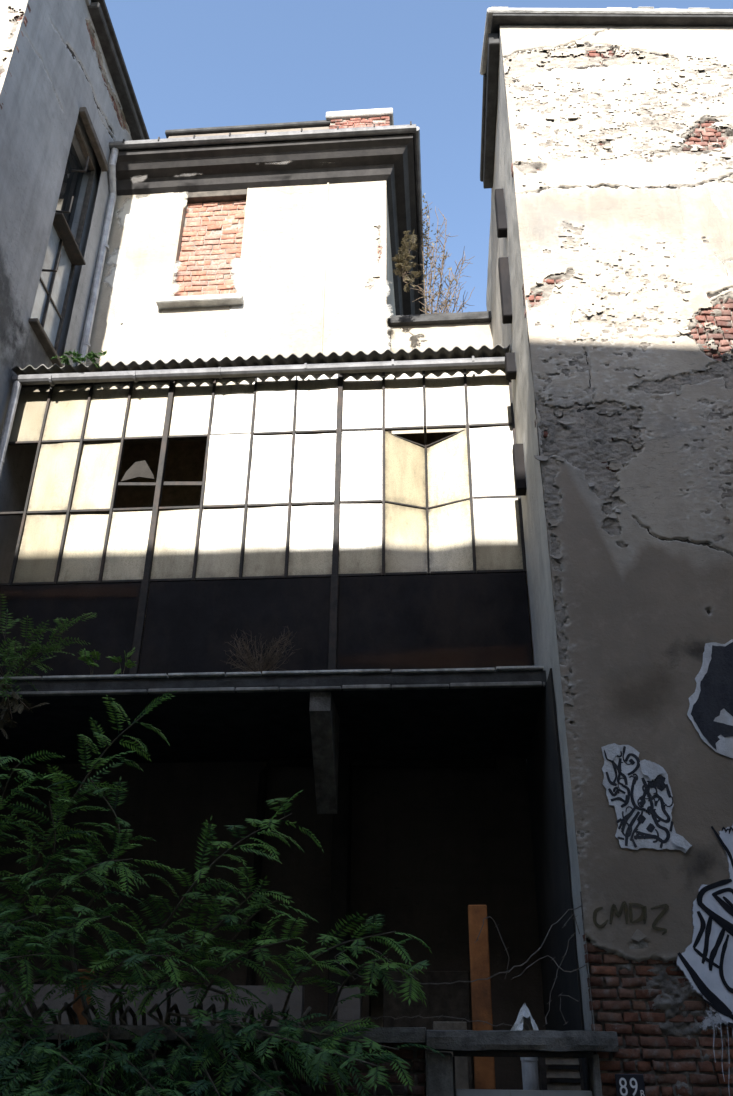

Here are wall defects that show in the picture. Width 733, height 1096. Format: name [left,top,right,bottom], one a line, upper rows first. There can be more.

flaking render [0,4,31,111]
crack [66,44,114,139]
peeling [504,40,733,189]
crack [525,173,733,194]
peeling [104,192,280,364]
peeling [347,224,391,353]
flaking render [522,222,733,706]
crack [633,517,733,557]